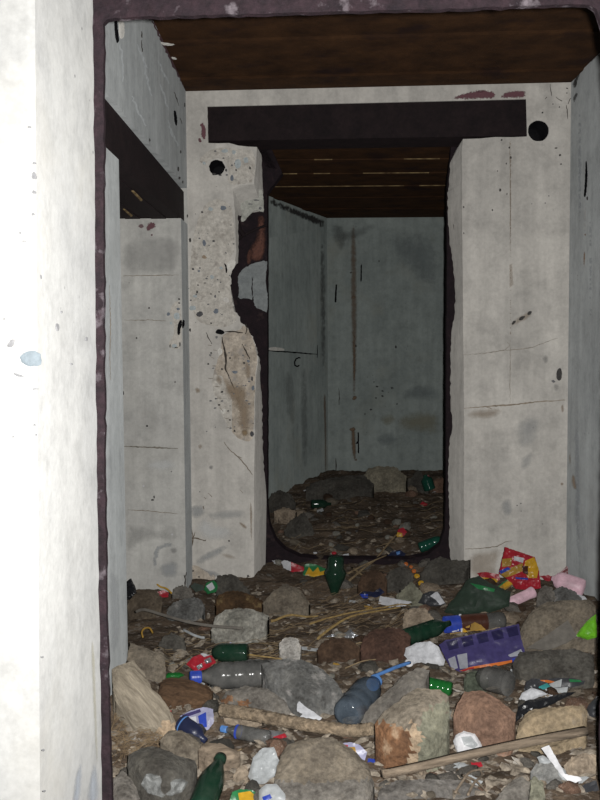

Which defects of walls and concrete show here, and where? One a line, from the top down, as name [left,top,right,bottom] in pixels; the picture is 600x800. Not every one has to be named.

spalling [167,189,268,441]
spalling [199,147,255,185]
corrosion [247,217,265,264]
crack [206,325,252,474]